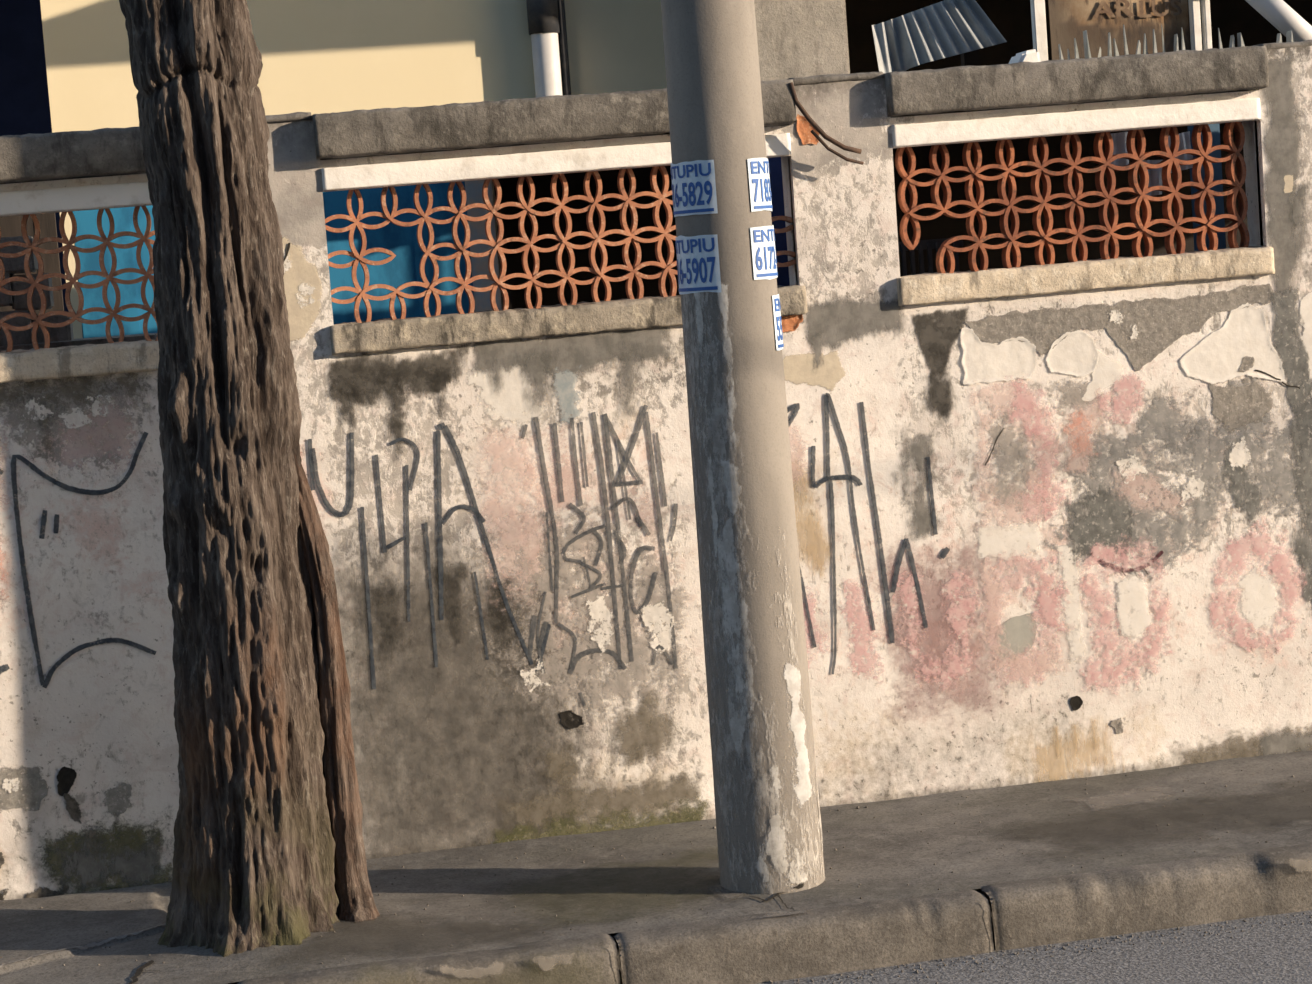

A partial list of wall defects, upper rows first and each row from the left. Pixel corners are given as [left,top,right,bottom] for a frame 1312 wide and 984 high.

peeling [282,237,322,341]
peeling [783,351,846,391]
peeling [960,284,1305,662]
peeling [468,284,826,895]
spalling [0,766,81,823]
water stain [57,826,160,890]
spalling [26,884,69,898]